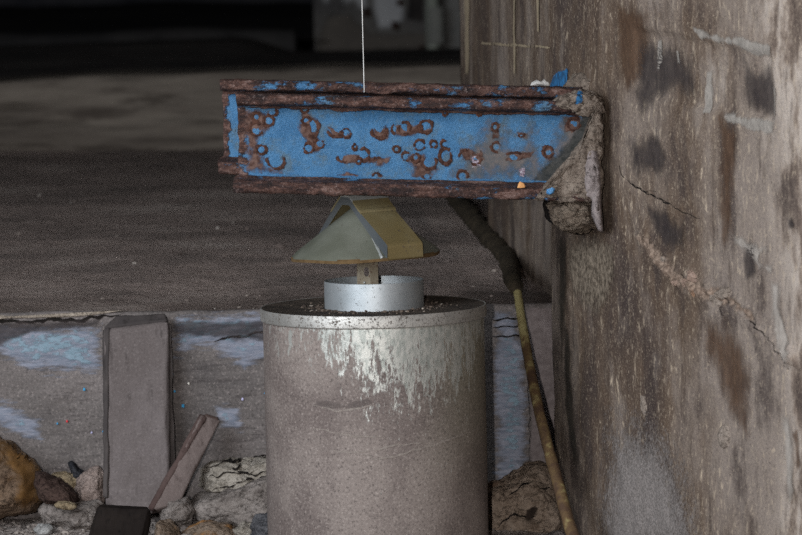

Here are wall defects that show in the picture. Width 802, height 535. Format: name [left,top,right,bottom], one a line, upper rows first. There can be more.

water stain [637,40,693,108]
water stain [724,73,775,133]
rust [245,109,286,173]
rust [300,108,554,180]
water stain [632,138,664,171]
crack [619,166,700,219]
spalling [635,237,753,320]
crack [0,313,123,324]